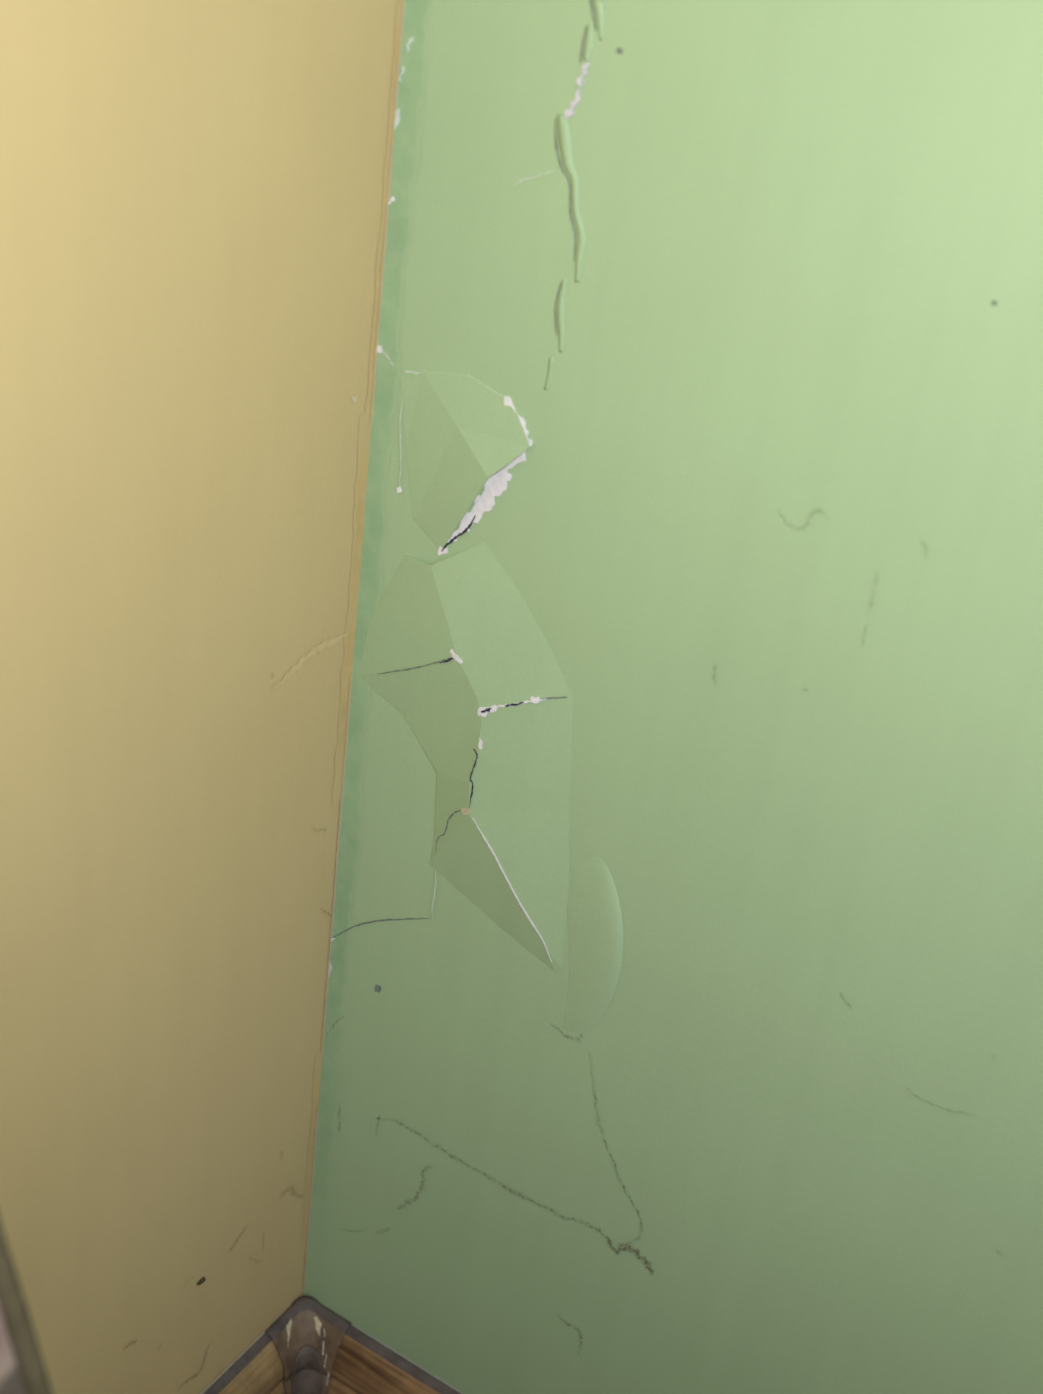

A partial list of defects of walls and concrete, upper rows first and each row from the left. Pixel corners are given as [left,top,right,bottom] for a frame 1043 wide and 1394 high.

flaking render [438,396,533,555]
crack [379,649,463,674]
crack [477,696,567,717]
crack [331,868,438,942]